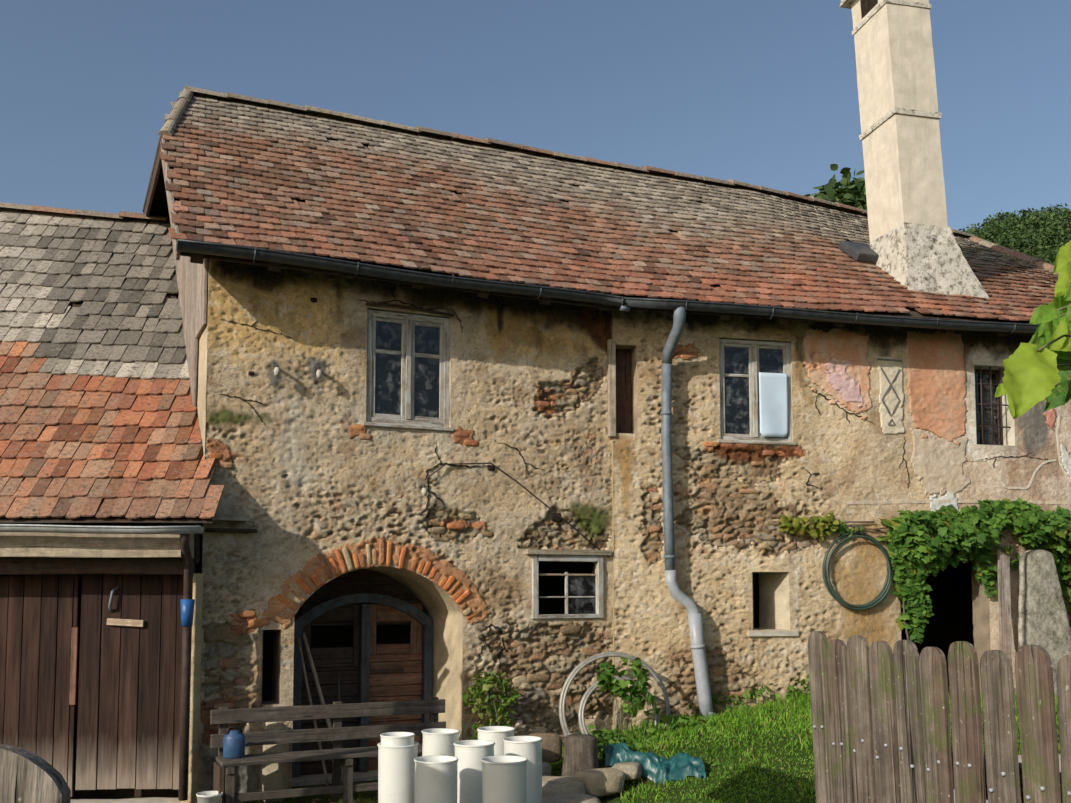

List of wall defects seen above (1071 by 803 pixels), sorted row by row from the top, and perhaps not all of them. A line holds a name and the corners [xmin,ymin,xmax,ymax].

crack [221,319,292,339]
crack [223,394,266,425]
spalling [532,356,604,418]
crack [805,384,874,424]
peeling [906,331,971,511]
crack [503,443,545,476]
crack [417,443,489,540]
spalling [640,441,826,564]
spalling [200,504,615,745]
spalling [662,658,699,716]
spalling [705,646,765,715]